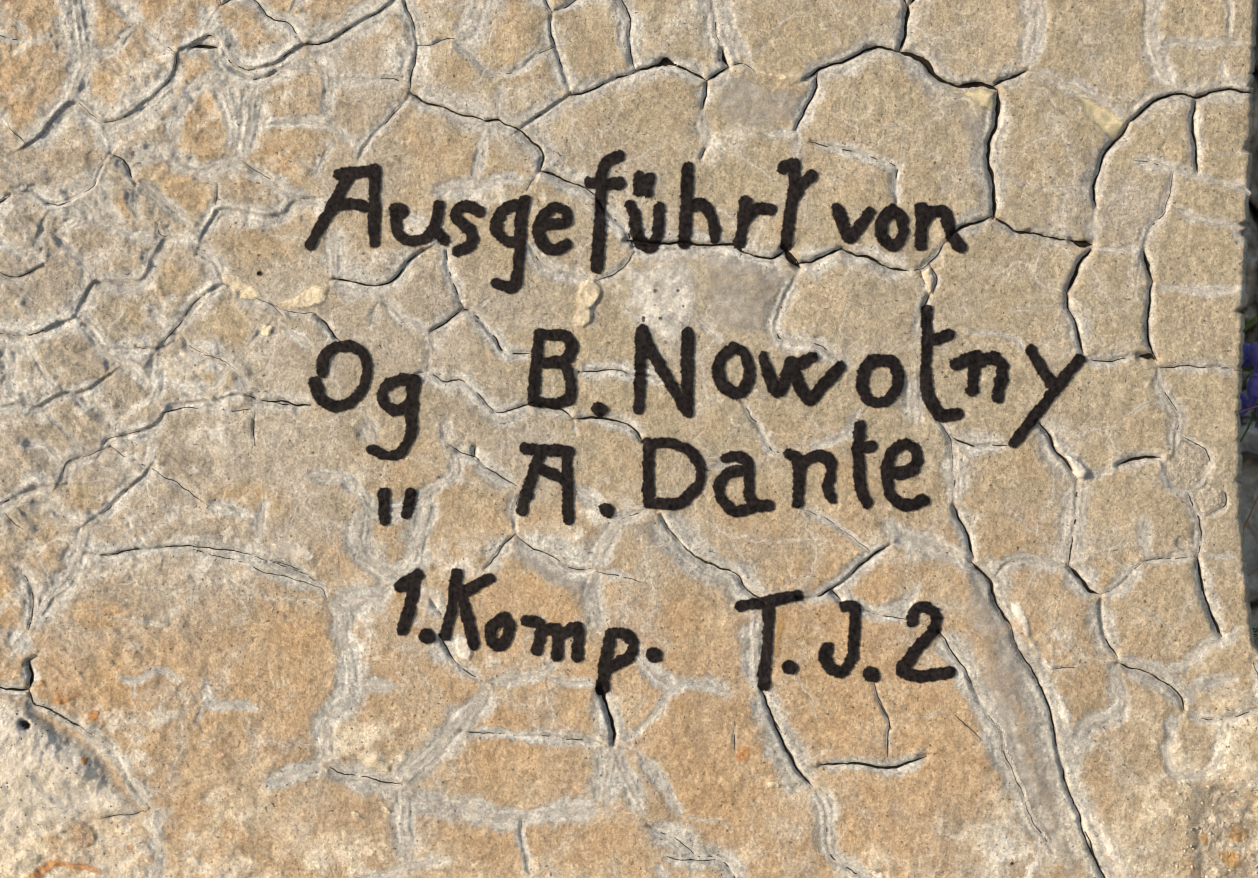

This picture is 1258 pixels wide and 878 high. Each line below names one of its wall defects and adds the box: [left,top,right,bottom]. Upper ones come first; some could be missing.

crack [102,789,164,878]
crack [0,0,764,745]
crack [265,600,735,878]
crack [533,0,1258,878]